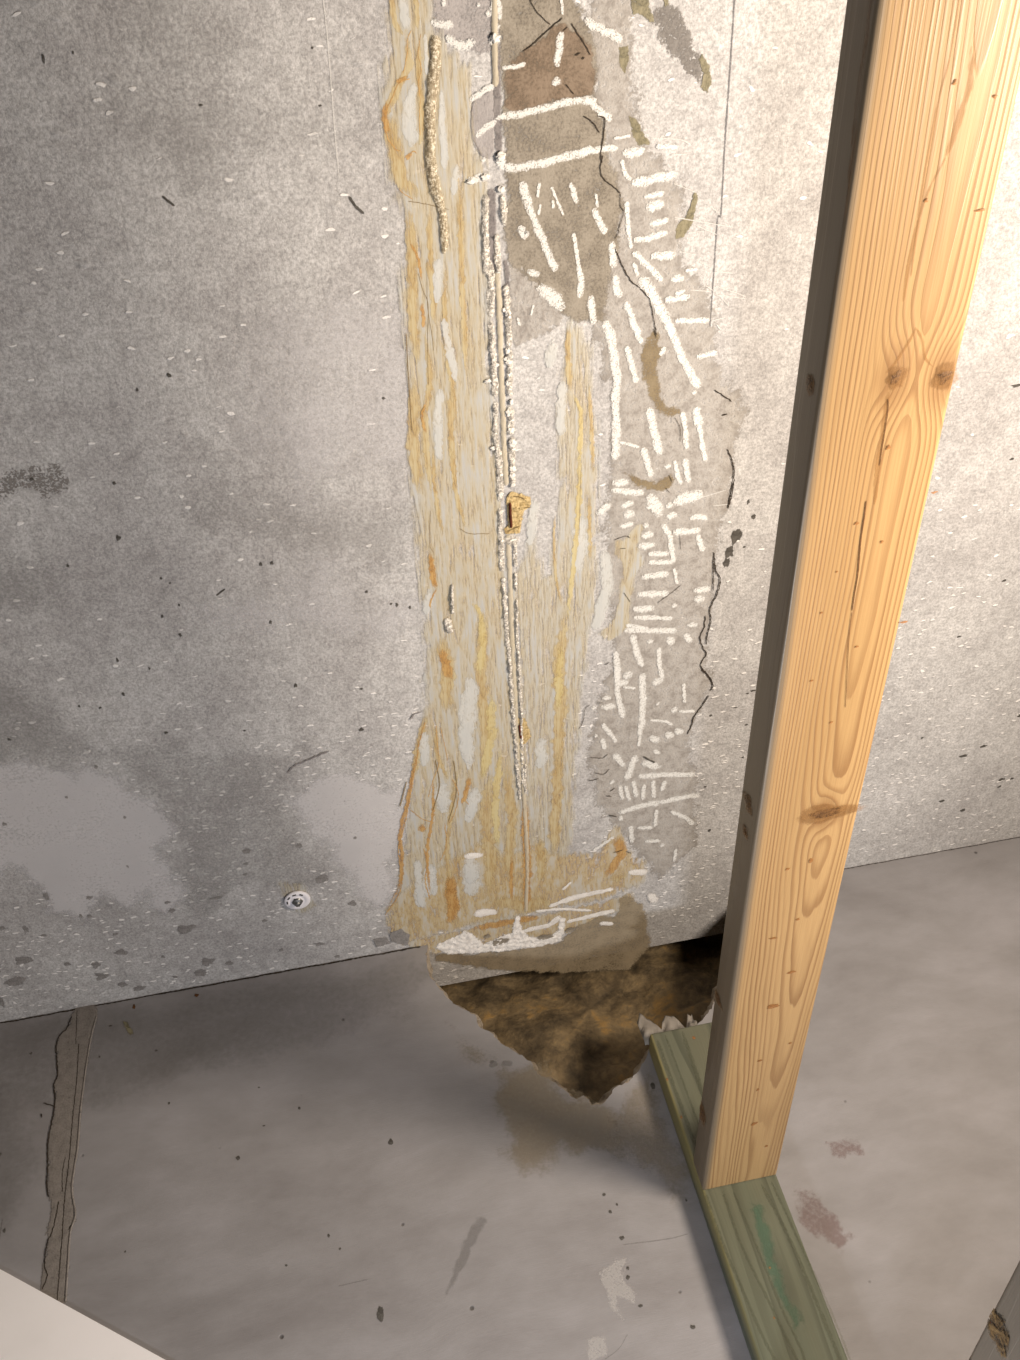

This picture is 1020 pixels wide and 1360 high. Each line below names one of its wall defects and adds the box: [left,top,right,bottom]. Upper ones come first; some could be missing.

crack [523,0,657,336]
rust [379,0,647,954]
spalling [504,492,531,534]
crack [727,449,735,509]
spalling [722,529,746,567]
crack [687,552,721,734]
spalling [518,718,531,744]
damp [0,761,185,925]
damp [291,773,411,907]
crack [0,946,420,1302]